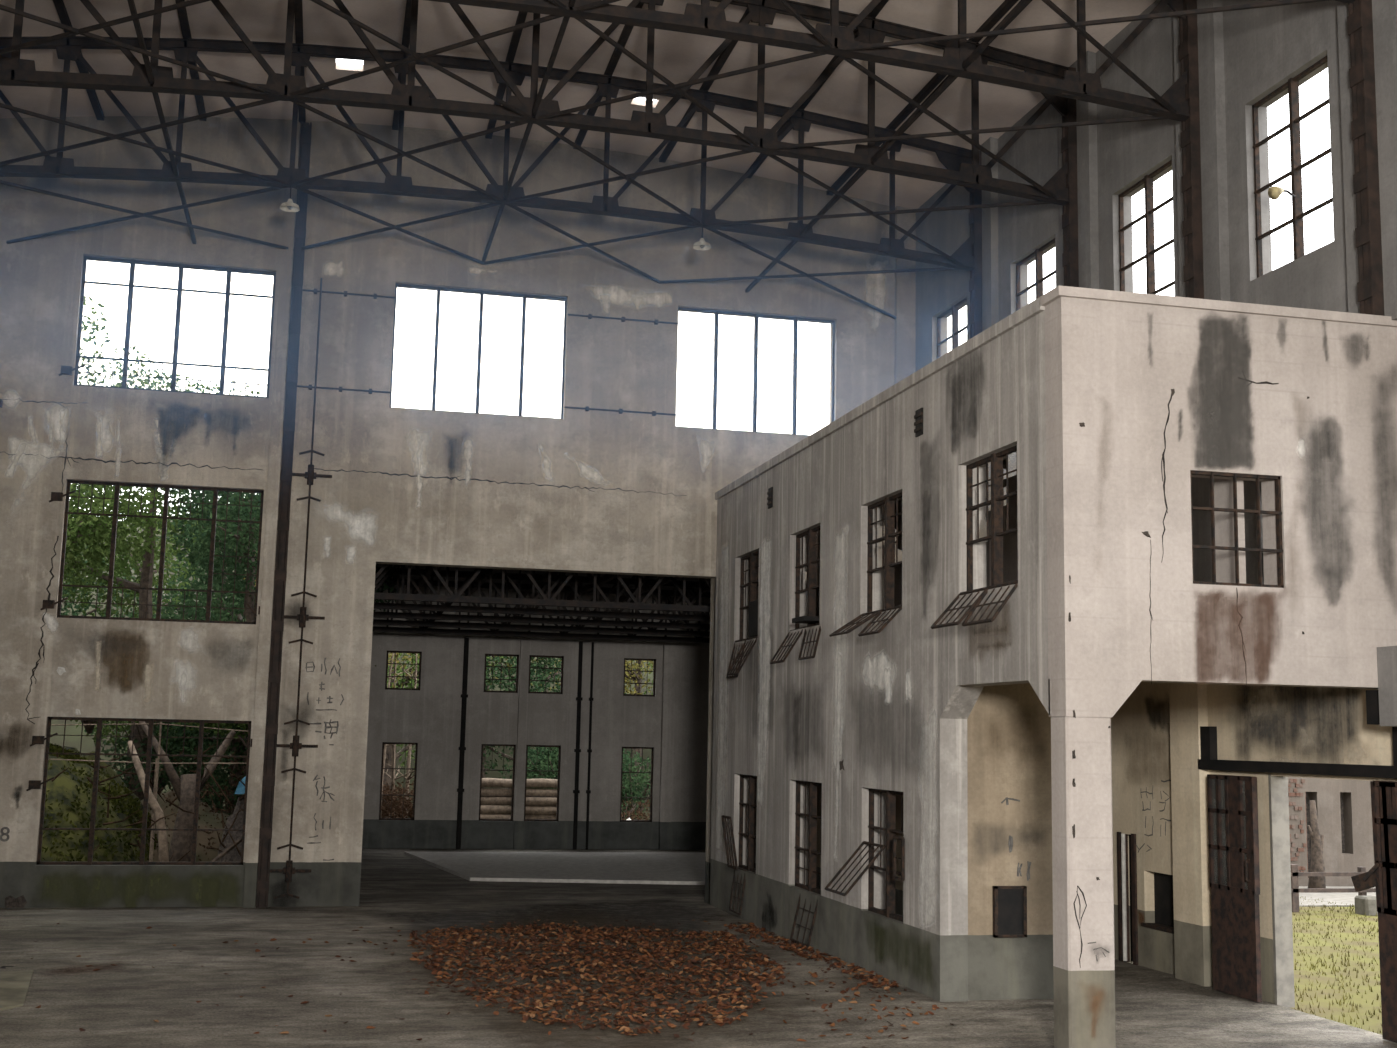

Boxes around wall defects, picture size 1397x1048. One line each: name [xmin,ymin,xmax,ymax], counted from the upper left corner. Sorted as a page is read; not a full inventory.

damp [156,404,249,479]
crack [1149,394,1172,684]
damp [1179,318,1252,468]
damp [1298,431,1349,600]
crack [25,536,59,724]
damp [144,665,152,702]